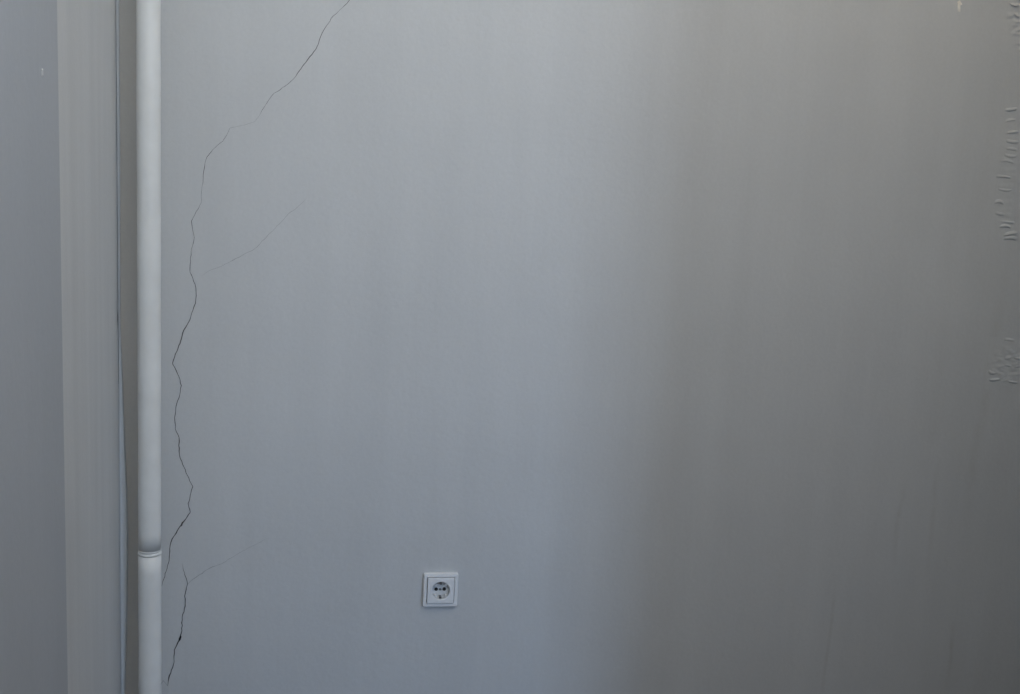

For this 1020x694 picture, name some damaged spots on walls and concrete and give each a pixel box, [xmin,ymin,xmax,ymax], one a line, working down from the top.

crack [258,1,349,117]
crack [162,131,229,682]